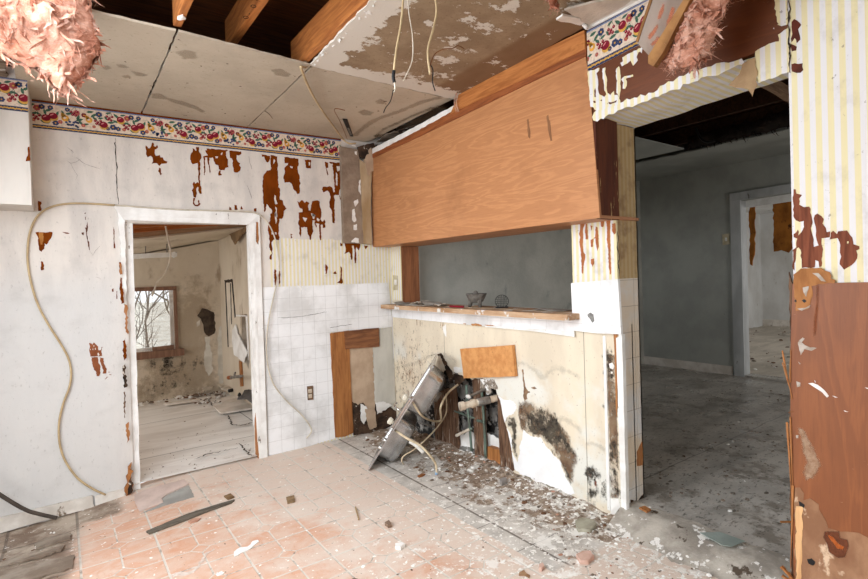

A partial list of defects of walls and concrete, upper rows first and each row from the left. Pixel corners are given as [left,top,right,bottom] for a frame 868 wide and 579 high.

peeling [145,143,167,175]
peeling [190,147,241,206]
peeling [36,232,70,270]
peeling [254,155,341,285]
peeling [579,221,616,274]
peeling [792,189,859,311]
flaking render [197,308,223,384]
water stain [508,369,577,481]
water stain [585,351,621,514]